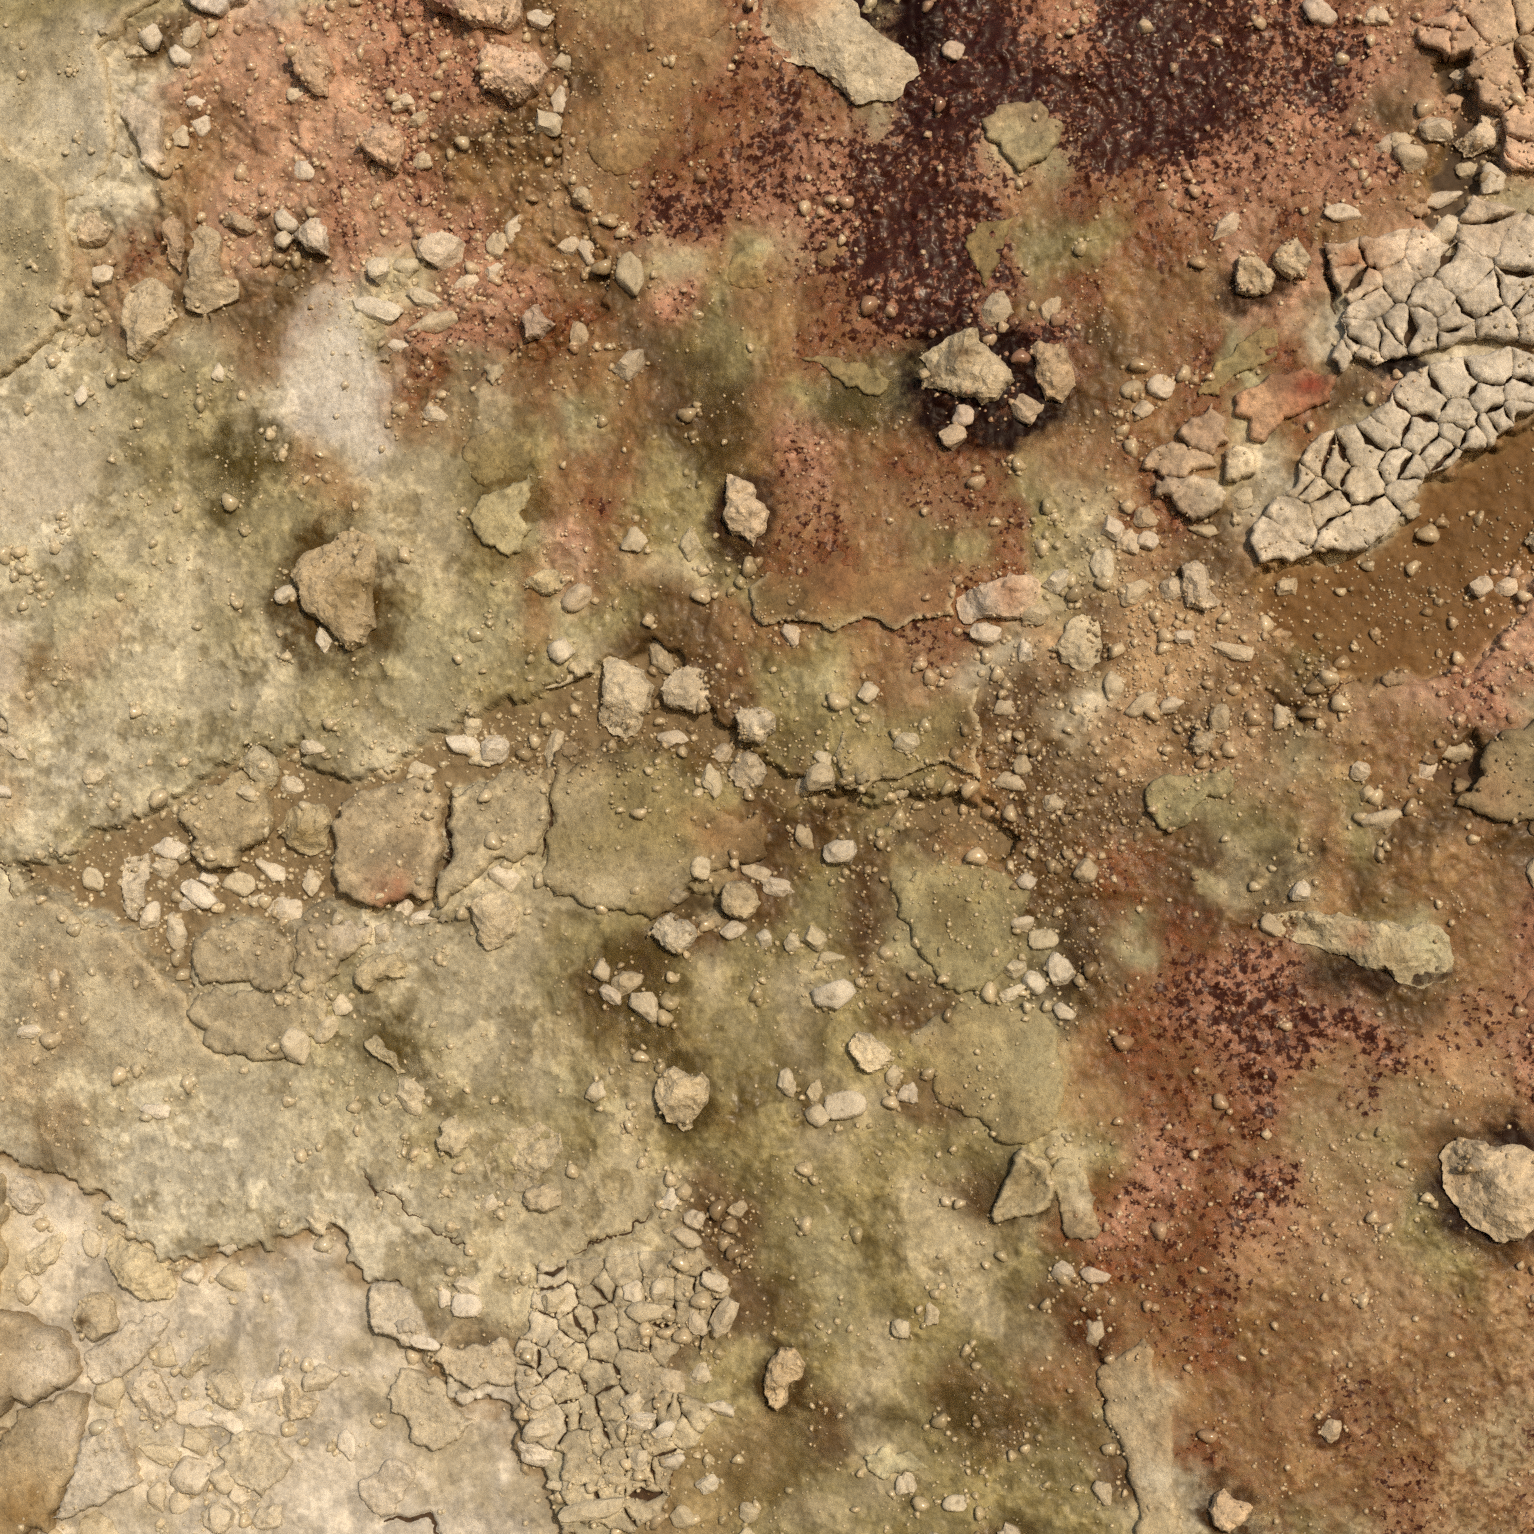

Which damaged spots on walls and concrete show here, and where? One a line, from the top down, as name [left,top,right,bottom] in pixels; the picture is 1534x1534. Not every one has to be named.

rust [613,0,1452,388]
crack [1249,0,1534,564]
rust [761,406,872,574]
rust [875,376,1029,604]
crack [0,862,33,898]
crack [436,798,453,898]
crack [541,766,557,857]
spalling [0,641,1102,1241]
rust [1056,889,1534,1382]
spalling [0,1152,576,1534]
crack [514,1213,731,1534]
rust [1311,1364,1448,1534]